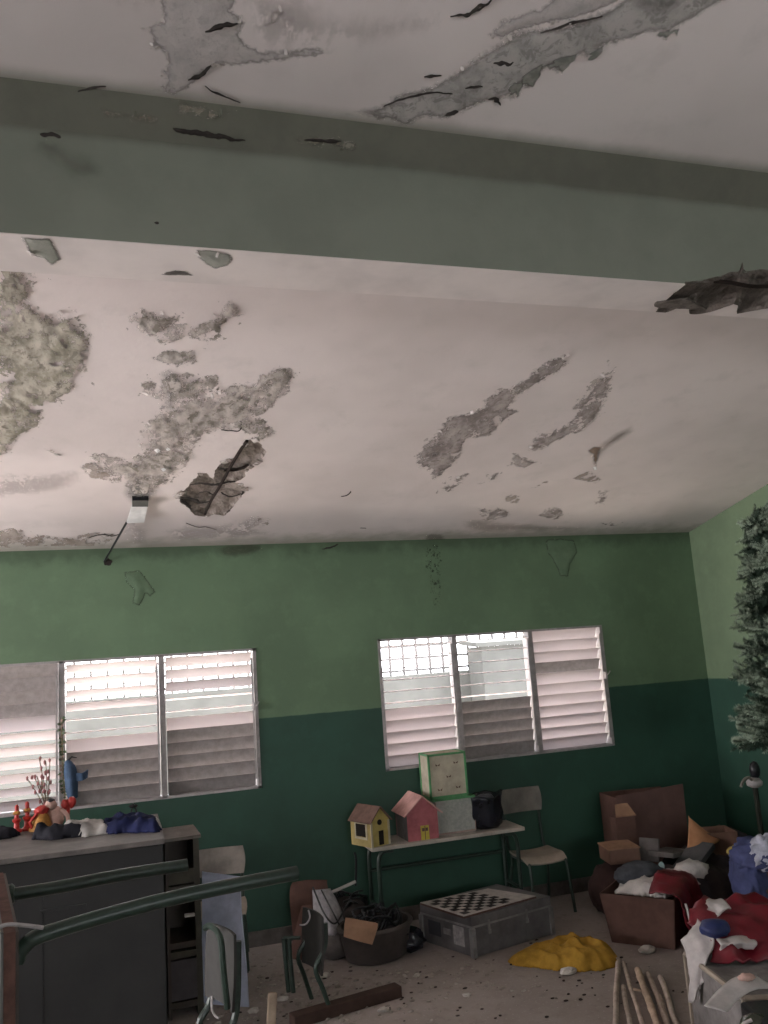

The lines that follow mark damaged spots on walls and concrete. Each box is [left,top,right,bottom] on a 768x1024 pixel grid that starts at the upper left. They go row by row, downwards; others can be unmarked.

crack [188,65,240,103]
crack [205,22,238,33]
peeling [140,0,322,94]
crack [384,74,501,116]
crack [450,0,492,18]
peeling [370,0,718,123]
crack [173,128,245,142]
crack [304,137,341,145]
spalling [654,262,768,314]
peeling [0,271,94,455]
peeling [80,304,300,518]
peeling [417,353,570,493]